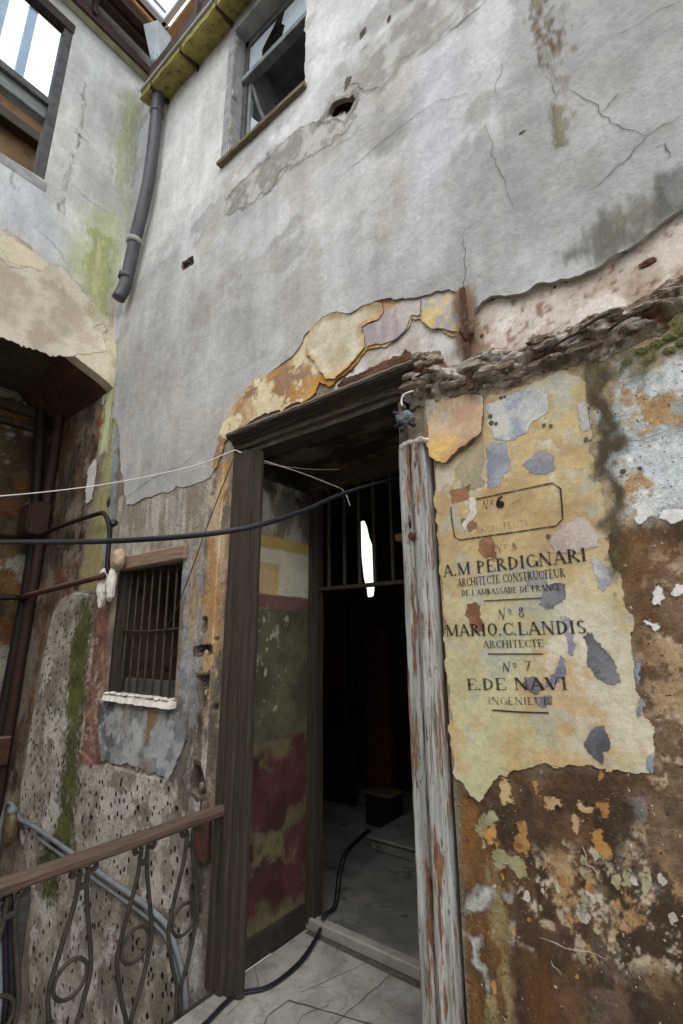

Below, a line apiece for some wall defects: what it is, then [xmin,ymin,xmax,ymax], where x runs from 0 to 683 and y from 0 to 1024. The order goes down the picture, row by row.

peeling [225,0,467,215]
crack [546,77,683,185]
peeling [0,231,110,357]
leakage [83,227,111,321]
peeling [213,291,463,469]
corrosion [452,286,482,391]
peeling [98,669,211,781]
peeling [474,777,566,923]
peeling [562,798,668,935]